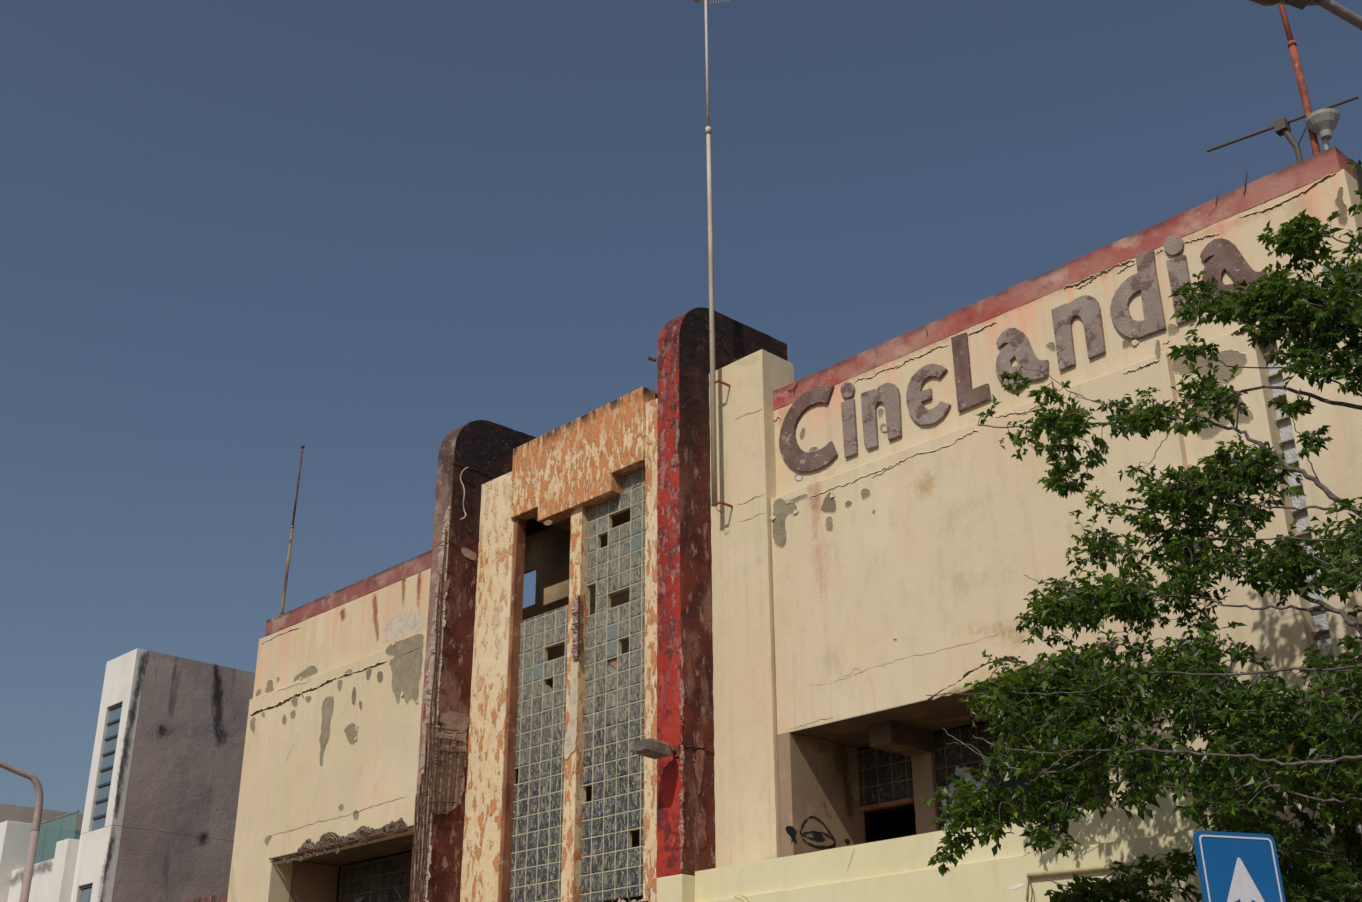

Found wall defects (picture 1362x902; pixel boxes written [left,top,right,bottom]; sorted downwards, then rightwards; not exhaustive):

crack [1184,172,1337,244]
crack [1063,259,1135,290]
crack [1231,326,1257,336]
spalling [770,474,876,548]
leakage [212,665,226,742]
crack [250,647,420,716]
spalling [255,506,477,902]
spalling [678,647,707,871]